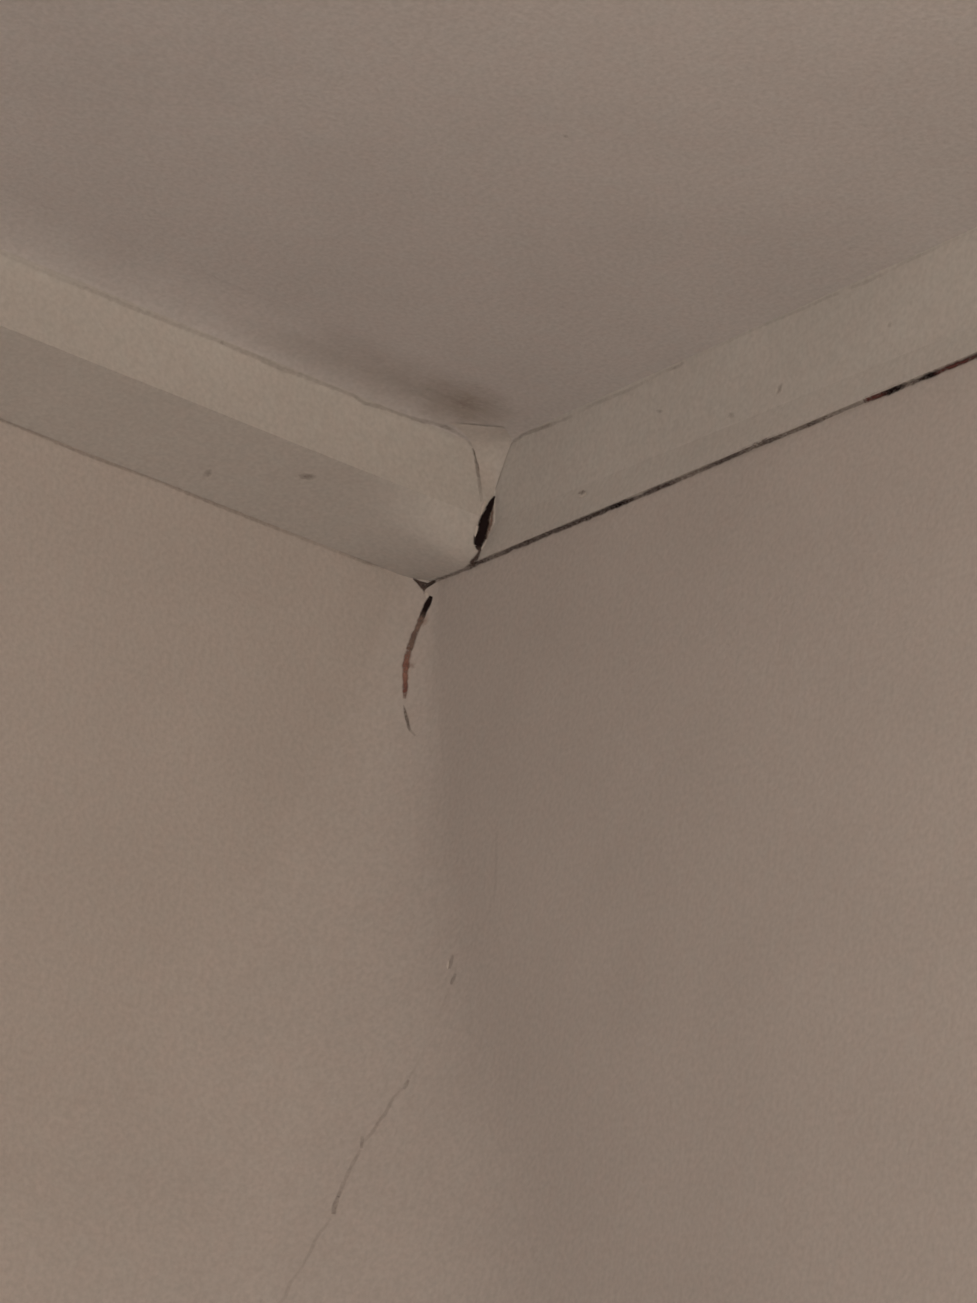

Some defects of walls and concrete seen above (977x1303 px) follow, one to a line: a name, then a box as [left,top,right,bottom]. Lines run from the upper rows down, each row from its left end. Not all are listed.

crack [402,354,977,725]